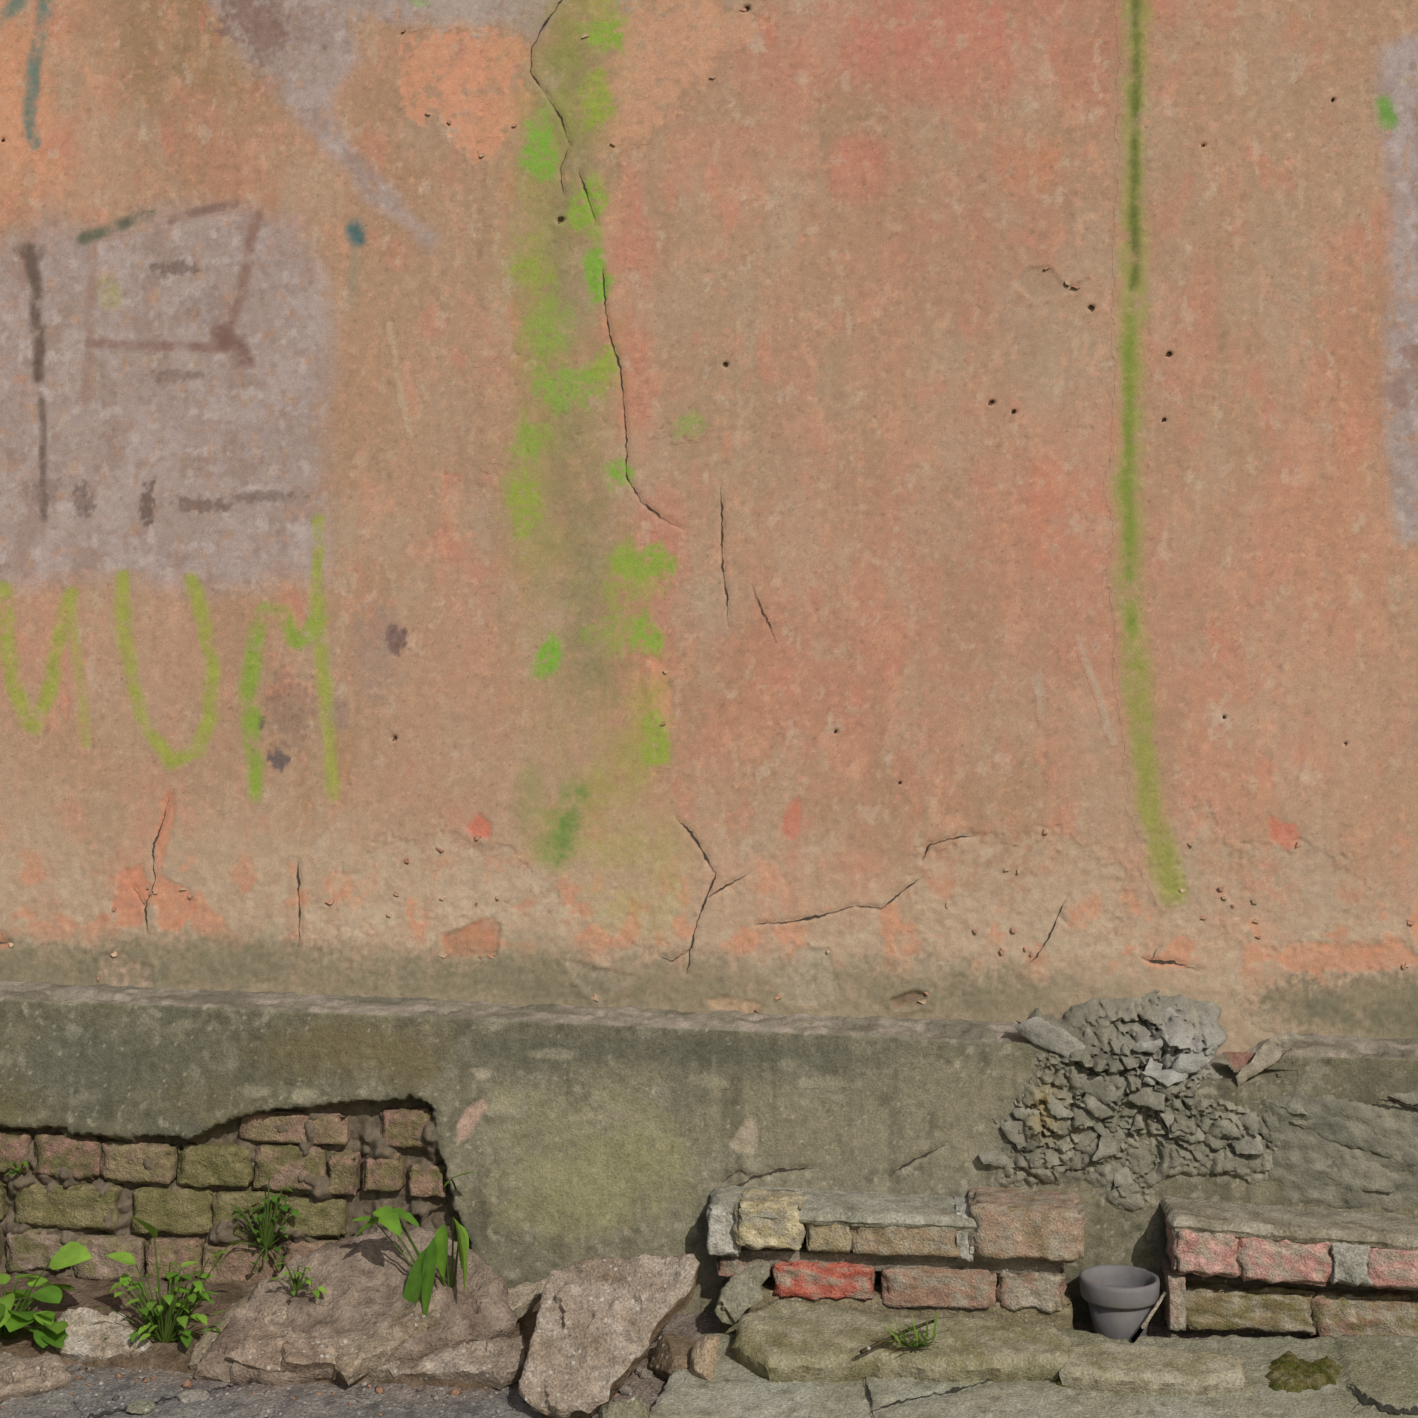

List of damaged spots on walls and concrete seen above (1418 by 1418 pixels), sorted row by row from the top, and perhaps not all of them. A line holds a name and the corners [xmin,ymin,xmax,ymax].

crack [530,0,596,224]
crack [603,270,679,526]
crack [665,823,746,971]
crack [756,836,967,924]
crack [1025,901,1068,969]
peeling [1265,813,1302,850]
spalling [1222,1051,1256,1072]
spalling [0,1094,481,1284]